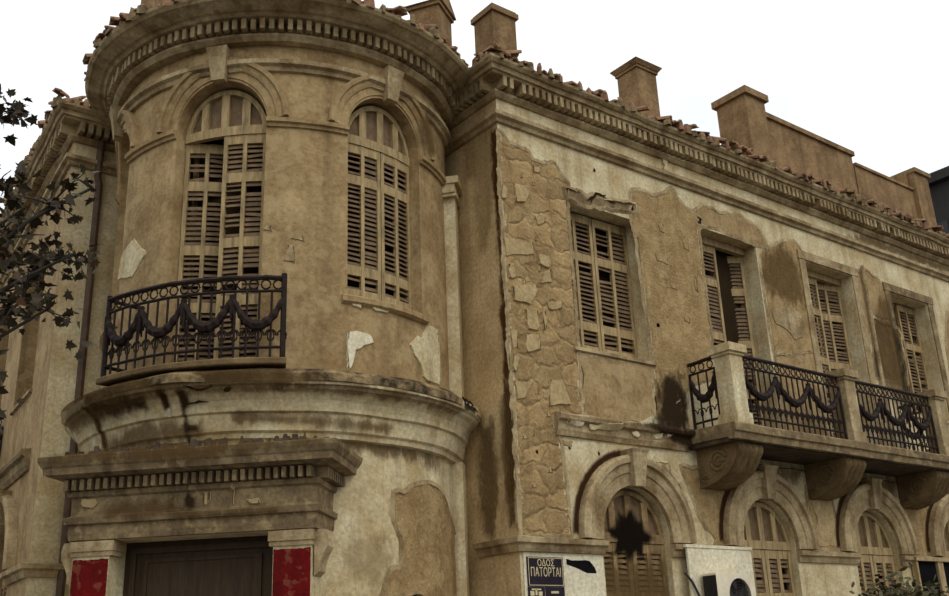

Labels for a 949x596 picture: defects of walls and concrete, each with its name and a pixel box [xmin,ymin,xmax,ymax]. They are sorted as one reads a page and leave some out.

damp [762,247,804,303]
flaking render [496,127,825,546]
damp [61,369,464,434]
damp [54,422,278,462]
flaking render [379,480,457,596]